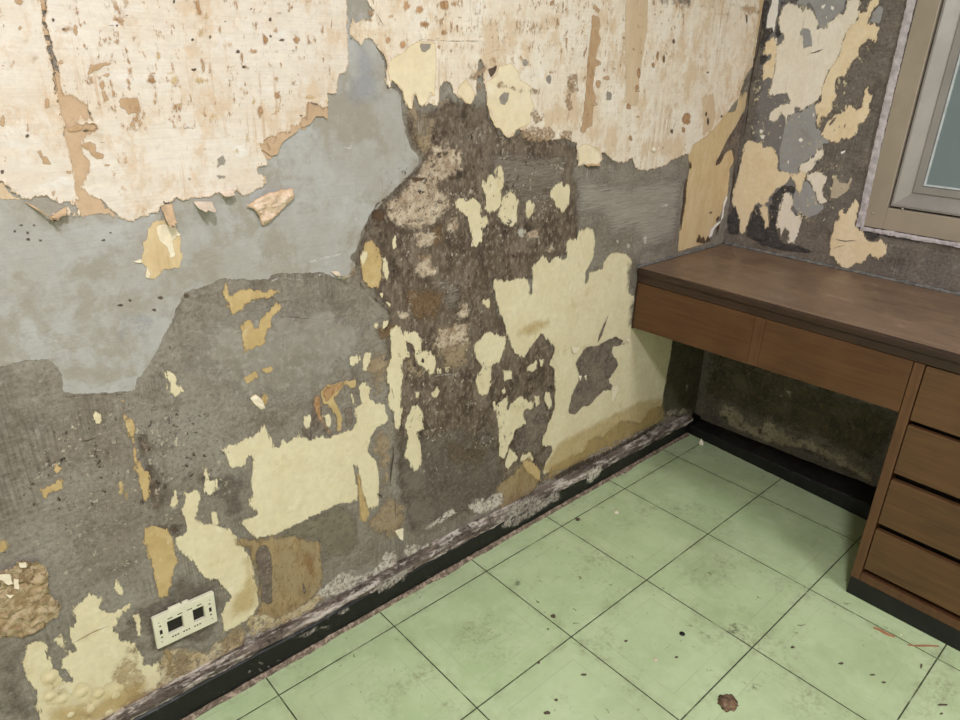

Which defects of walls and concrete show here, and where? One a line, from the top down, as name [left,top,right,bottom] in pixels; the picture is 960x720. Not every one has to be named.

peeling [0,0,693,720]
leakage [113,98,891,708]
peeling [709,0,887,268]